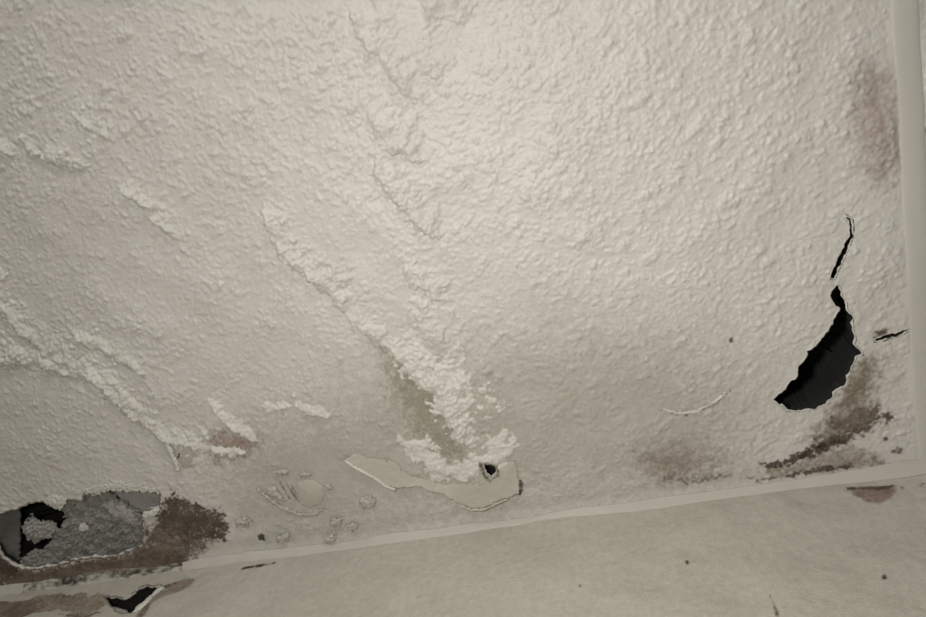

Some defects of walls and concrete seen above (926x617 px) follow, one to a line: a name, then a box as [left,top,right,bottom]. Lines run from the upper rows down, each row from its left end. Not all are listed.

crack [829,214,855,280]
crack [874,328,910,342]
water stain [760,358,894,480]
peeling [344,452,523,512]
spalling [0,480,161,571]
spalling [103,584,165,614]